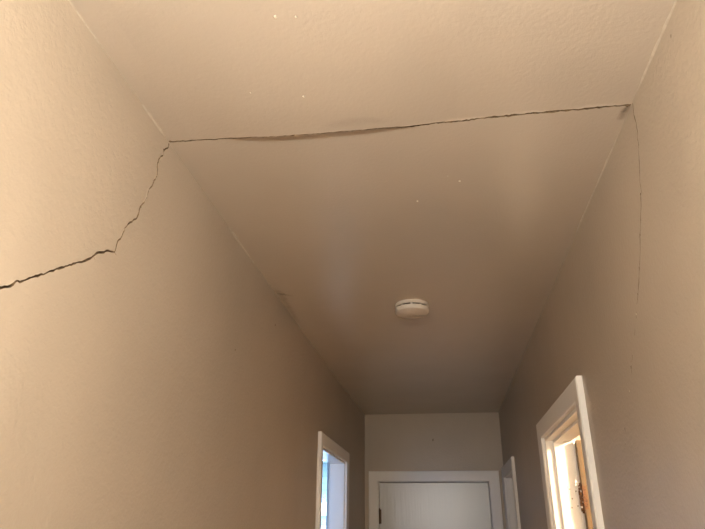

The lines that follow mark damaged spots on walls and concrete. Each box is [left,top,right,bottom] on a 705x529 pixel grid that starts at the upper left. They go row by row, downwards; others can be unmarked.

crack [271,103,639,146]
crack [0,138,228,289]